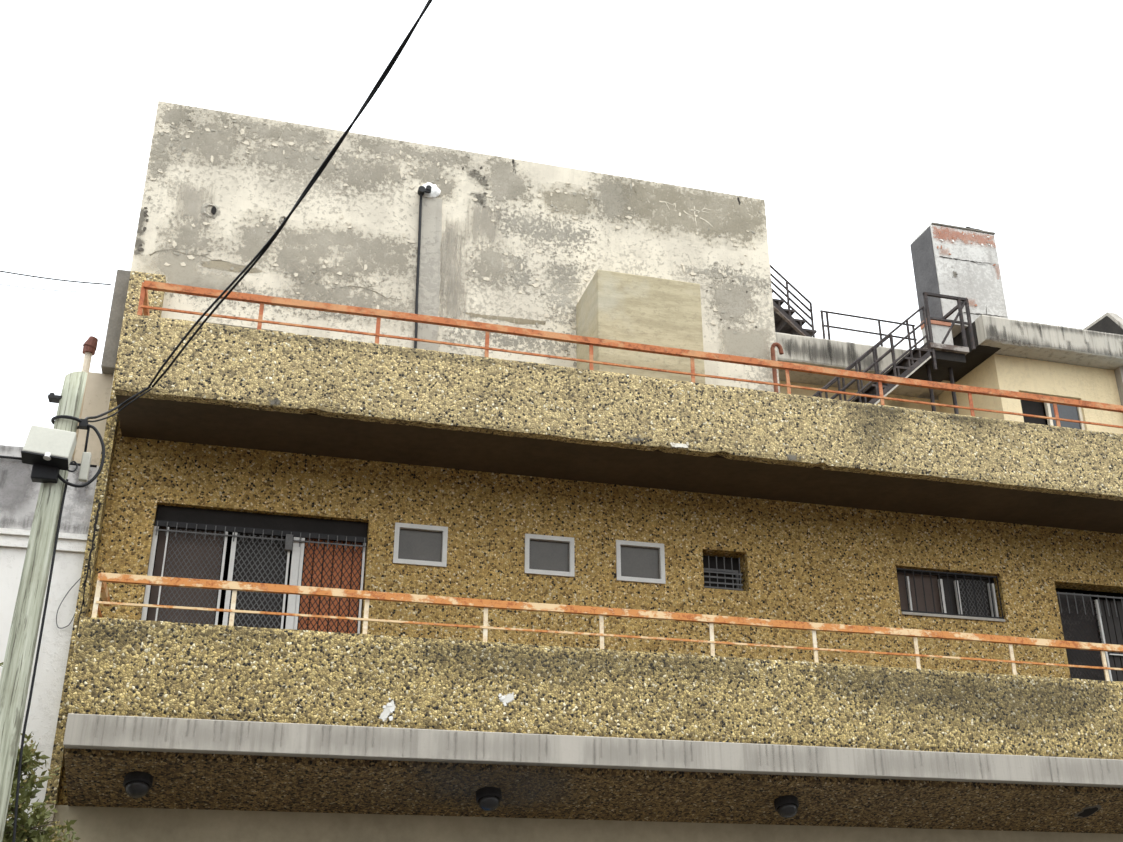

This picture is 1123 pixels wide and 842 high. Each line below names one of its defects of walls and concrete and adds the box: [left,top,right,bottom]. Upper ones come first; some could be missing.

leakage [152,250,238,290]
leakage [440,222,465,319]
leakage [285,268,413,320]
leakage [722,329,769,359]
leakage [785,340,880,370]